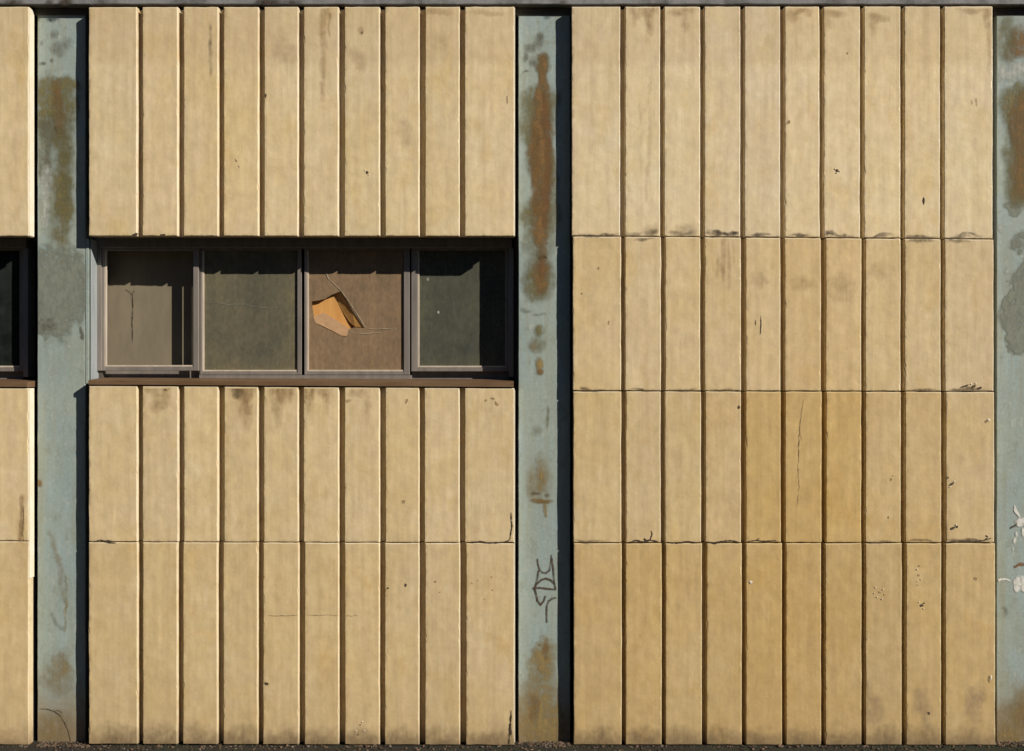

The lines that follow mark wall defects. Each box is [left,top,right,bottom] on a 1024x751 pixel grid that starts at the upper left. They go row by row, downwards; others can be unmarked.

damp [41,167,74,243]
corrosion [522,54,556,301]
corrosion [1001,82,1024,205]
corrosion [532,466,550,516]
corrosion [520,642,562,742]